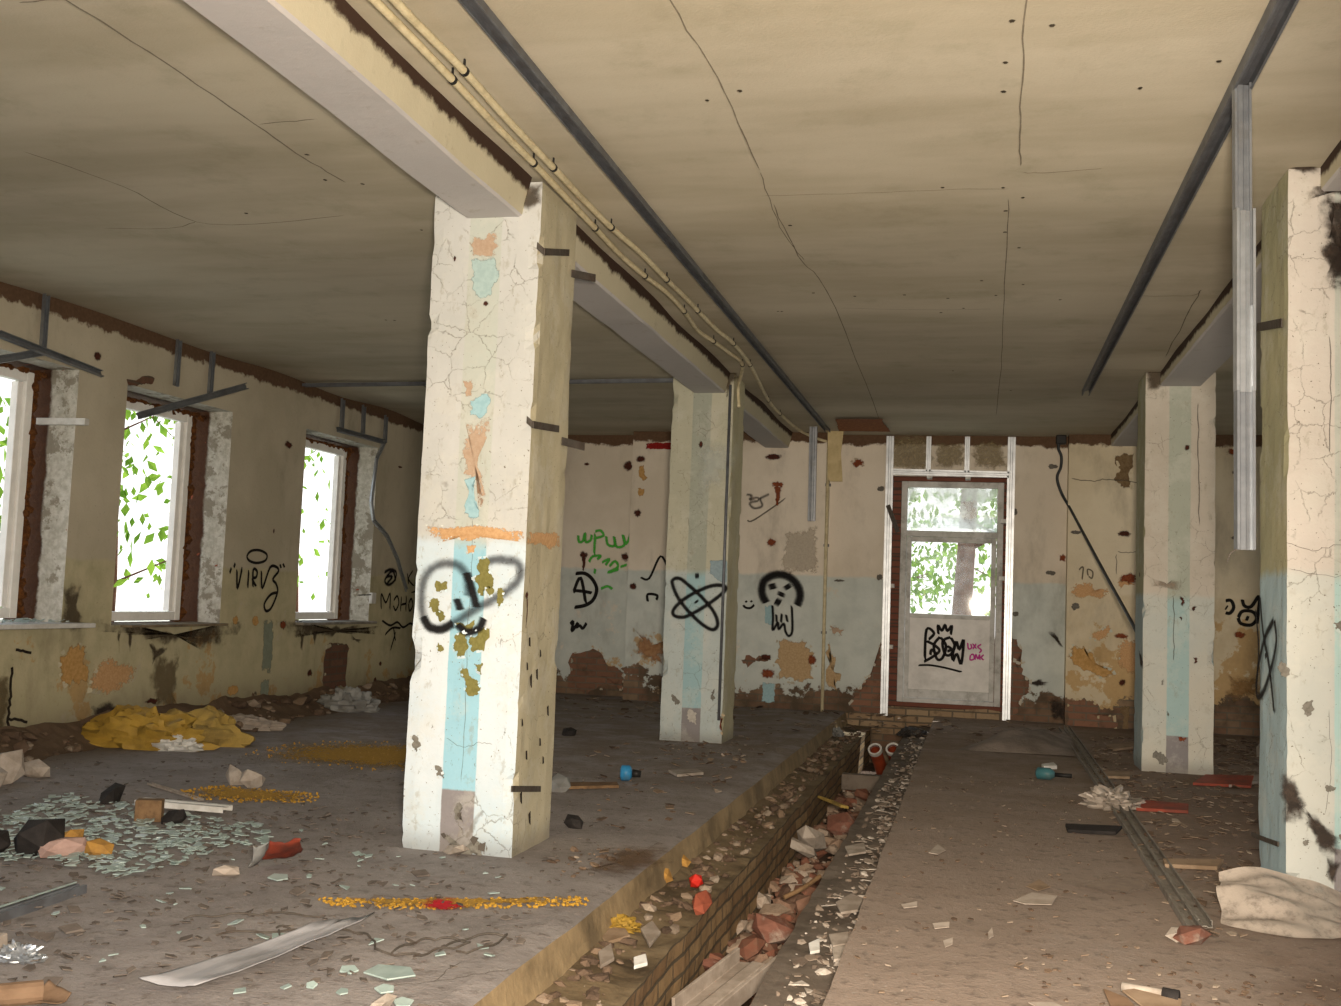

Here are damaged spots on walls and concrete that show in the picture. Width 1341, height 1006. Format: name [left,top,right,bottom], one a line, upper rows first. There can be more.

crack [670,0,902,418]
damp [1316,187,1341,276]
peeling [470,233,500,298]
crack [996,201,1010,413]
peeling [426,381,560,608]
peeling [1071,581,1134,599]
peeling [58,643,137,695]
flaking render [568,649,624,694]
peeling [632,628,663,663]
peeling [1069,625,1135,679]
flaking render [1067,698,1118,729]
damp [1307,812,1339,881]